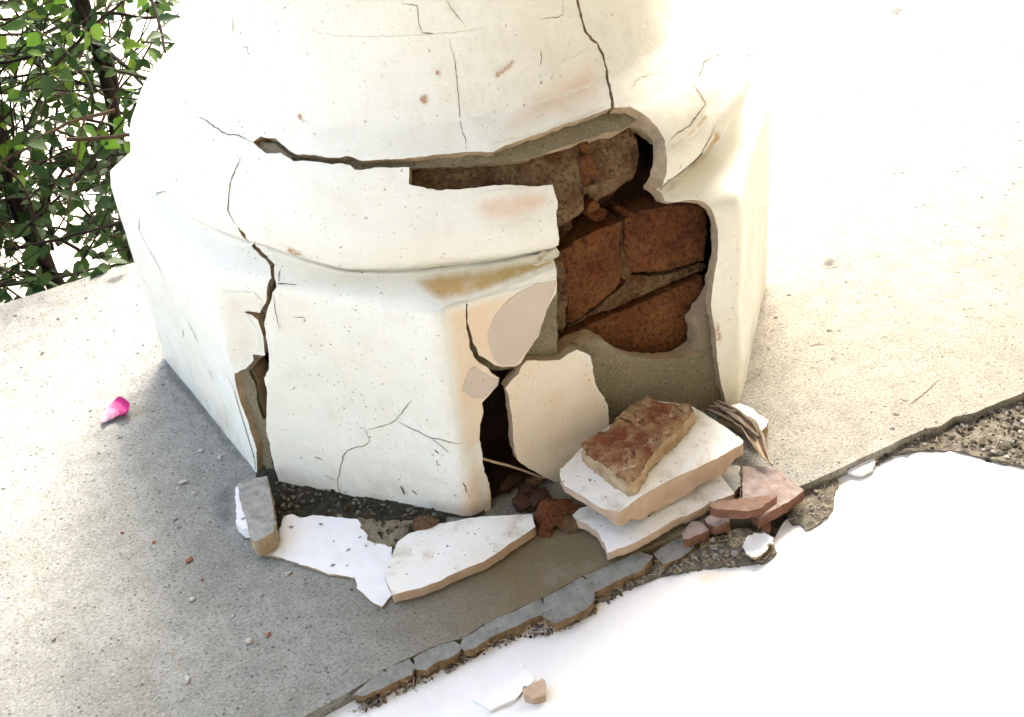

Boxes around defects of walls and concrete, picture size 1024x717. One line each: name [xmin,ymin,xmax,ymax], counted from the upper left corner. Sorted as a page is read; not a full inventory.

crack [297,0,487,151]
crack [544,0,669,109]
spalling [411,127,723,425]
spalling [240,355,274,469]
crack [325,402,460,493]